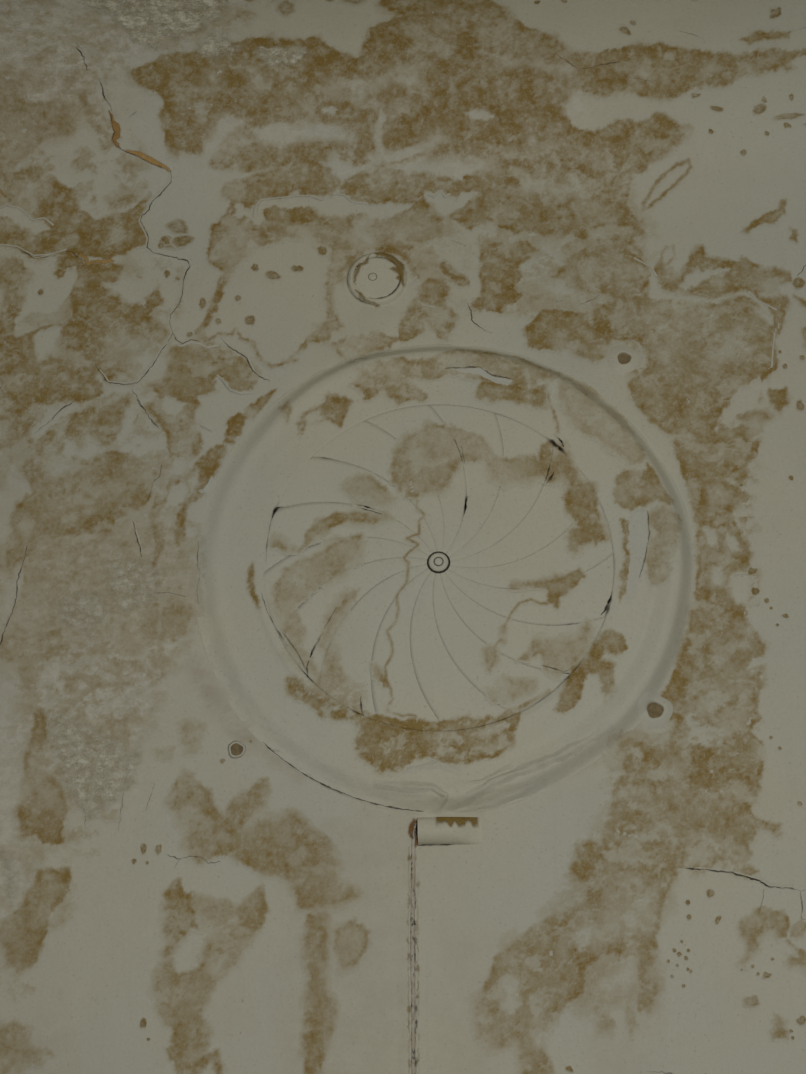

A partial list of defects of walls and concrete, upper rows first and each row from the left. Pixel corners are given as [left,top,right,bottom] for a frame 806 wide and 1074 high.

crack [96,170,272,422]
leakage [0,838,80,1003]
leakage [132,843,162,865]
leakage [139,716,374,1074]
crack [687,866,803,918]
leakage [0,1016,59,1074]